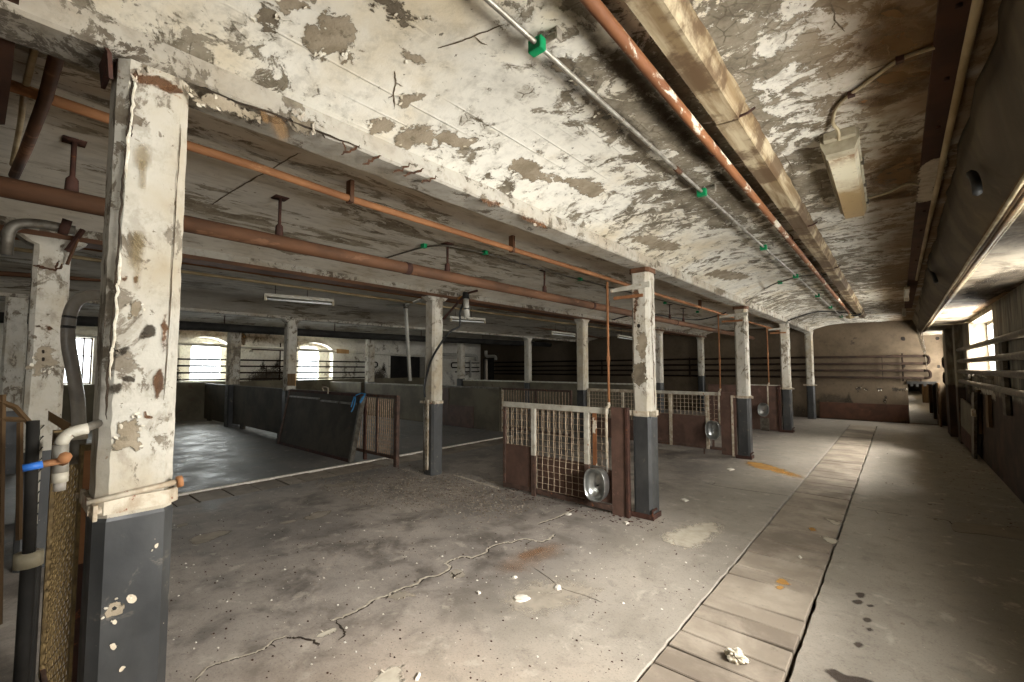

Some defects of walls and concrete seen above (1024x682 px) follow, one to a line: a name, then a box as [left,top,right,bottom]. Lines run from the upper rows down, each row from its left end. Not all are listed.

peeling [250,0,364,65]
peeling [368,0,427,30]
crack [439,25,503,48]
peeling [130,67,261,124]
crack [389,71,401,107]
peeling [547,55,599,90]
crack [202,87,438,183]
peeling [366,117,478,150]
crack [212,153,298,205]
peeling [507,157,606,198]
peeling [631,332,648,389]
crack [194,509,574,682]